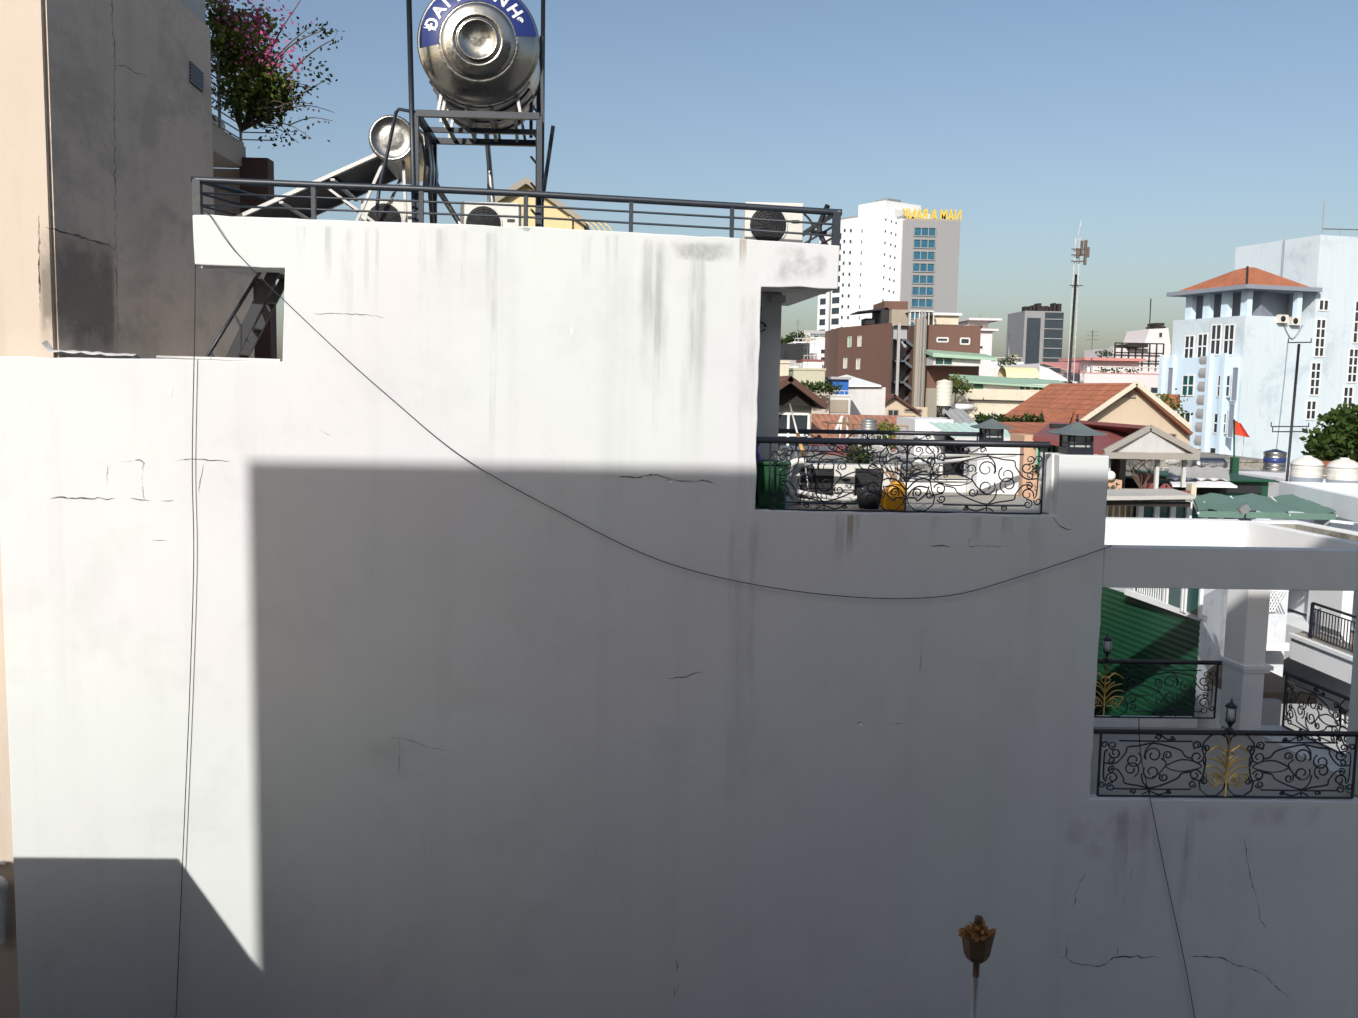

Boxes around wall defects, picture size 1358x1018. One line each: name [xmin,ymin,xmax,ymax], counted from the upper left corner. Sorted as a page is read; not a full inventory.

crack [50,458,227,502]
crack [619,474,718,485]
crack [1065,947,1159,967]
crack [1192,956,1287,996]